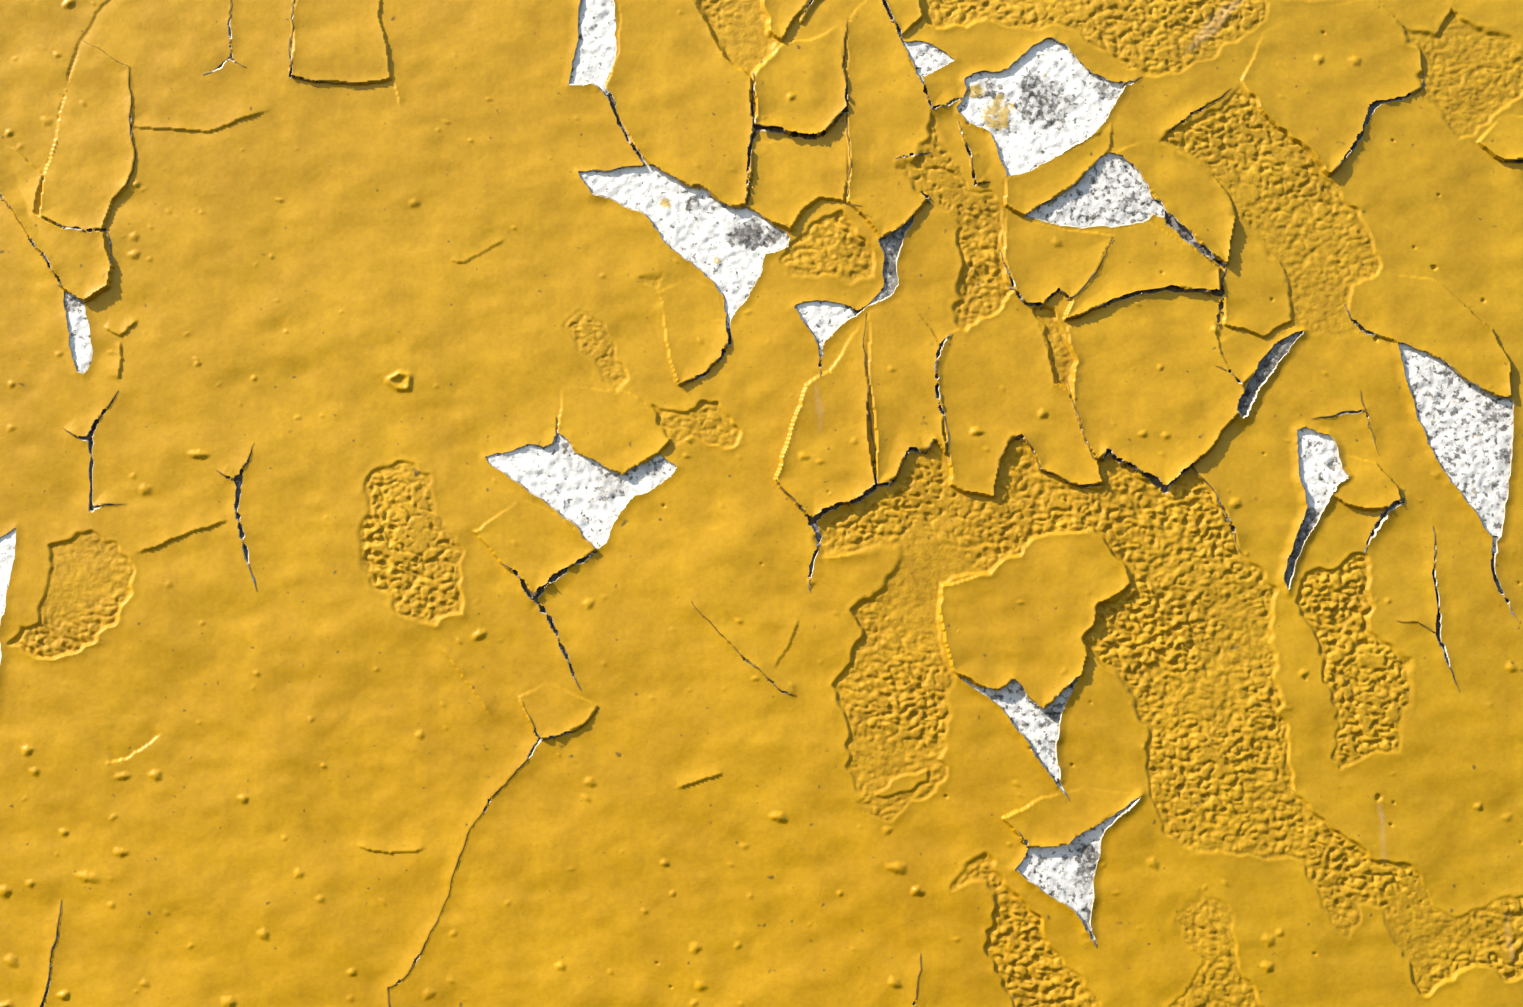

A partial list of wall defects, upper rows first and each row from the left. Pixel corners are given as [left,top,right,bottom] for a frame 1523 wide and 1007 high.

peeling [0,39,265,379]
peeling [453,238,504,263]
crack [746,22,862,231]
crack [1162,39,1426,177]
crack [1064,238,1245,492]
peeling [0,528,135,661]
peeling [360,462,464,625]
peeling [486,401,741,557]
crack [691,313,952,697]
peeling [563,0,1523,1007]
crack [1311,390,1404,553]
crack [382,528,600,1007]